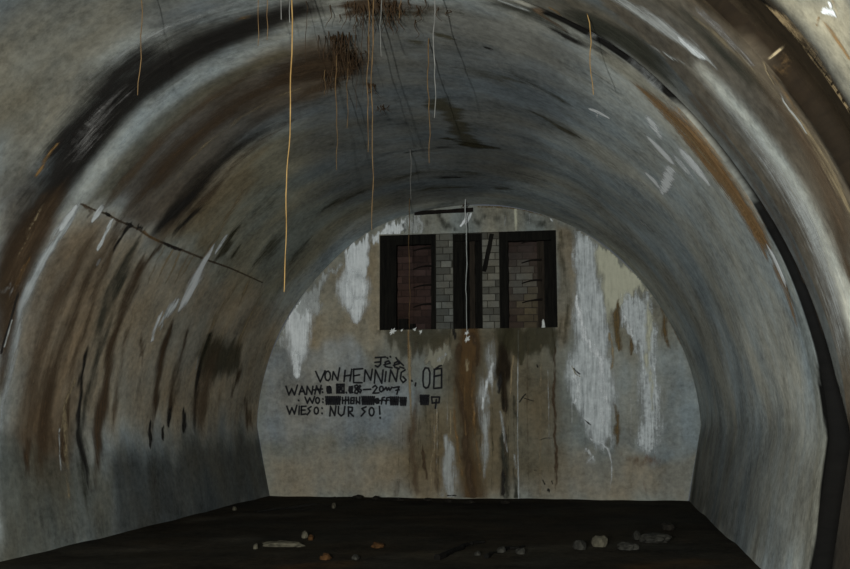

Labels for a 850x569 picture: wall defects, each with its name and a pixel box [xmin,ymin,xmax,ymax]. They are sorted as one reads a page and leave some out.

crack [80,204,263,283]
damp [193,296,261,422]
damp [279,215,423,378]
rust [453,329,483,498]
damp [479,327,557,499]
damp [566,231,663,469]
rust [613,302,634,355]
rust [637,85,795,320]
rust [791,114,850,278]